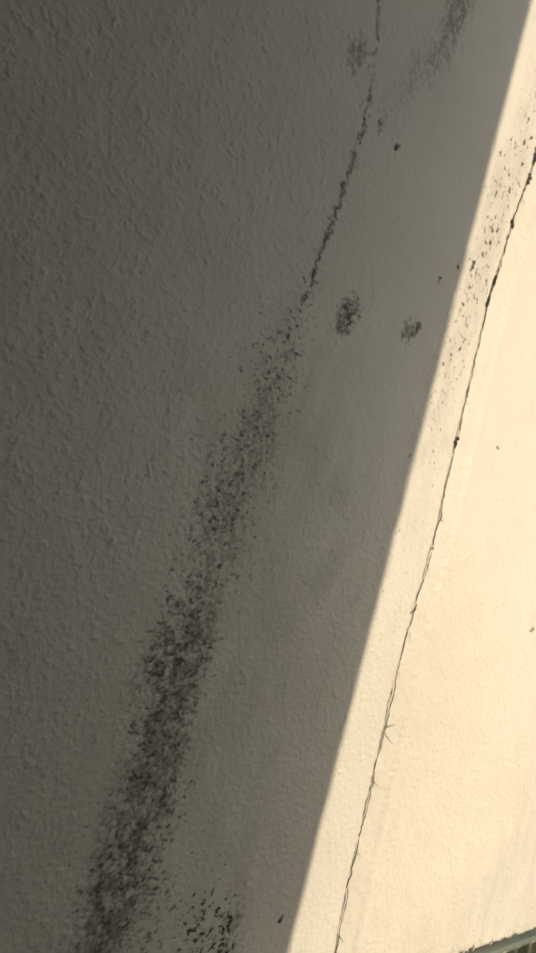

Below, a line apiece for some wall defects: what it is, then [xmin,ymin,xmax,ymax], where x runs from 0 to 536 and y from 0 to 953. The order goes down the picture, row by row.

crack [312,119,365,285]
damp [443,136,533,365]
crack [336,147,536,953]
damp [109,573,217,818]
damp [460,927,536,953]